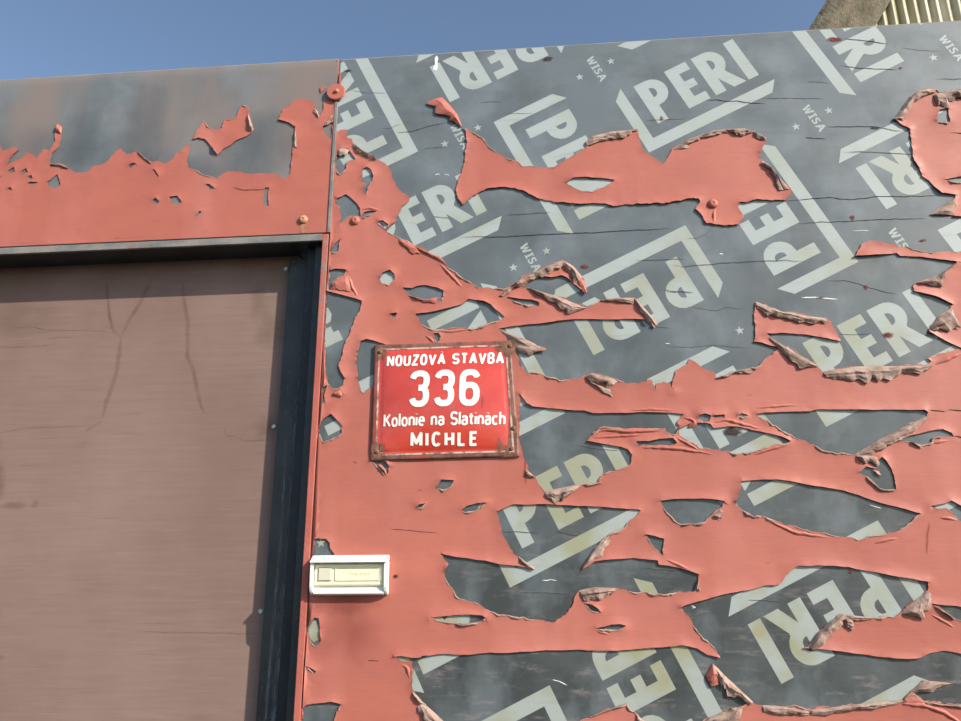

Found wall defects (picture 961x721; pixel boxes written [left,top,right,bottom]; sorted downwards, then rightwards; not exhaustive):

peeling [0,21,961,403]
peeling [319,414,342,443]
peeling [373,461,389,476]
peeling [314,538,334,556]
peeling [396,395,961,721]
peeling [308,618,321,647]
peeling [303,702,341,721]